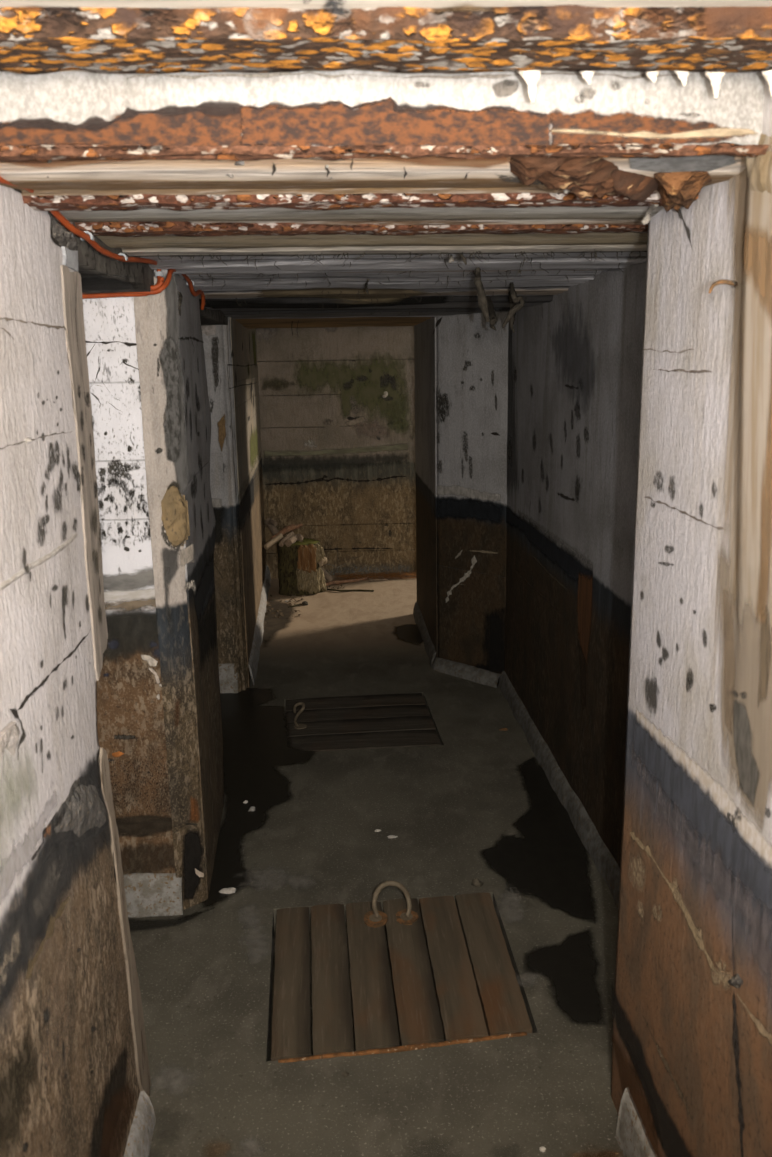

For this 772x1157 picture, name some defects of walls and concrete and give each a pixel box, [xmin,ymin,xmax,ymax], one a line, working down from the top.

rust [0,97,757,168]
spalling [499,155,736,213]
crack [0,273,149,450]
leakage [23,274,223,700]
crack [645,496,724,530]
rust [716,171,772,825]
crack [17,629,91,711]
leakage [263,600,294,644]
leakage [657,631,679,665]
spalling [0,709,26,762]
leakage [0,760,175,1006]
leakage [90,1051,134,1157]